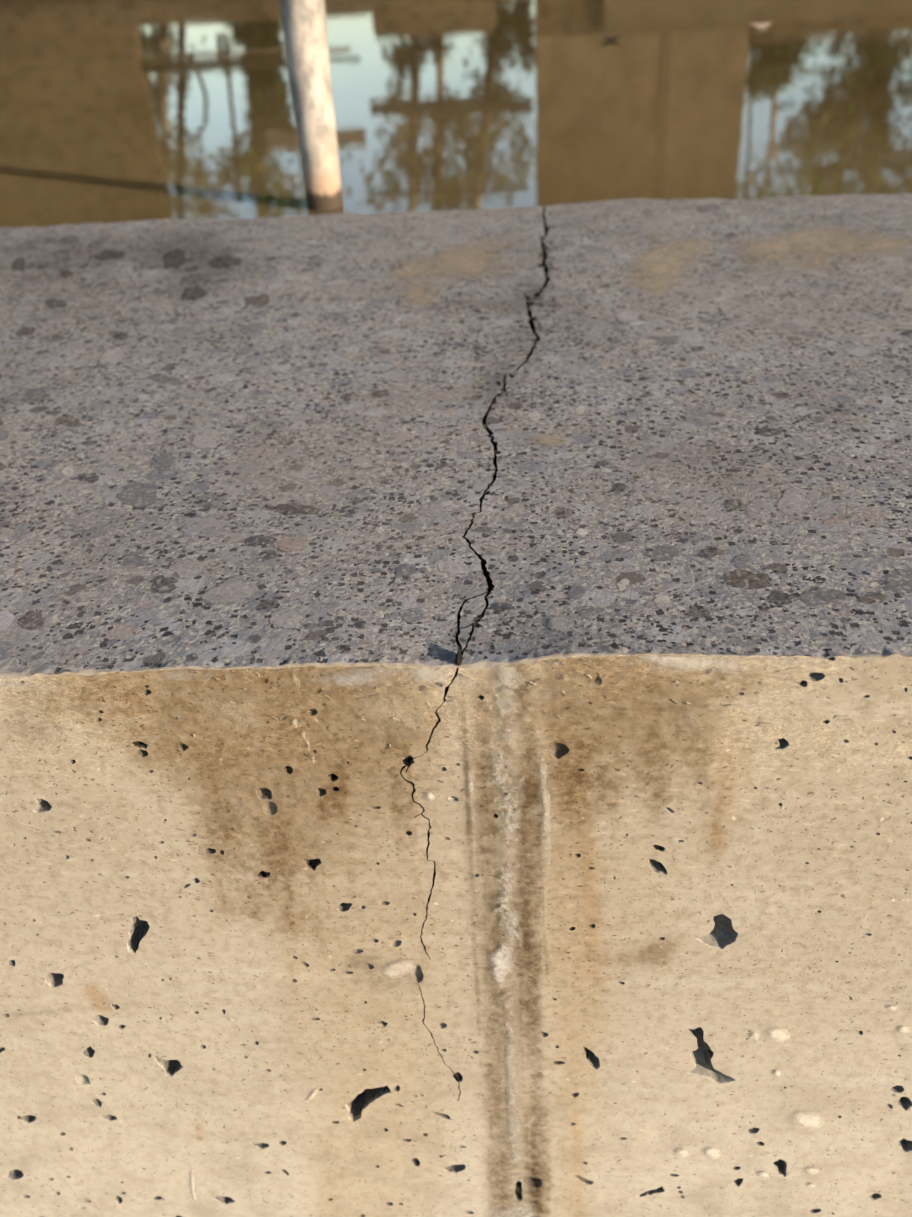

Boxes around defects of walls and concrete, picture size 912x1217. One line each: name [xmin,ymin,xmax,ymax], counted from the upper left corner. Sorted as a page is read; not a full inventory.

damp [336,669,385,685]
damp [412,668,448,682]
crack [400,207,552,1101]
damp [497,667,520,738]
damp [540,759,550,864]
damp [492,753,522,1005]